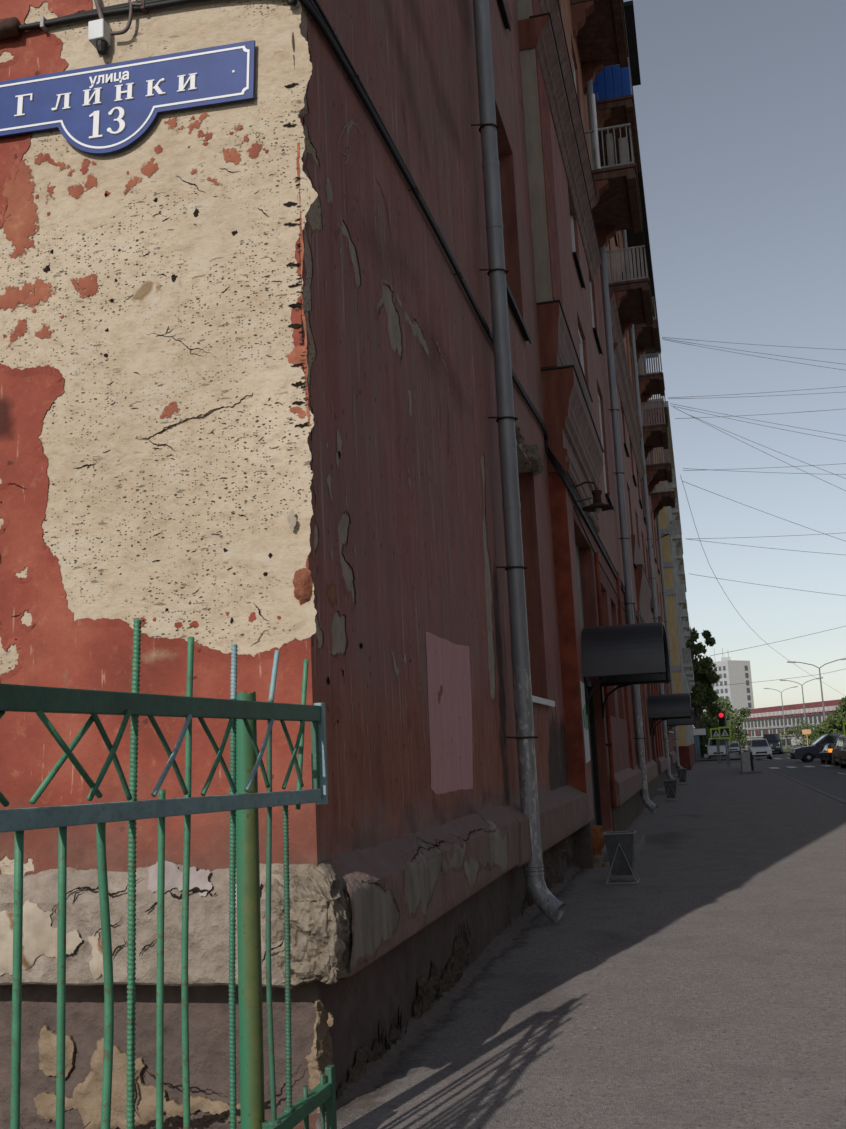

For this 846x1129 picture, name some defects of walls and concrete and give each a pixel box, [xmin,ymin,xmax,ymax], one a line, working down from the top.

flaking render [0,0,363,682]
peeling [375,278,448,372]
crack [135,391,252,451]
peeling [0,850,40,877]
spalling [0,900,104,979]
crack [52,878,217,956]
spalling [147,860,212,896]
spalling [260,860,400,987]
crack [407,826,498,862]
flaking render [33,1025,241,1129]
flaking render [292,1101,326,1129]
spalling [305,1000,336,1089]